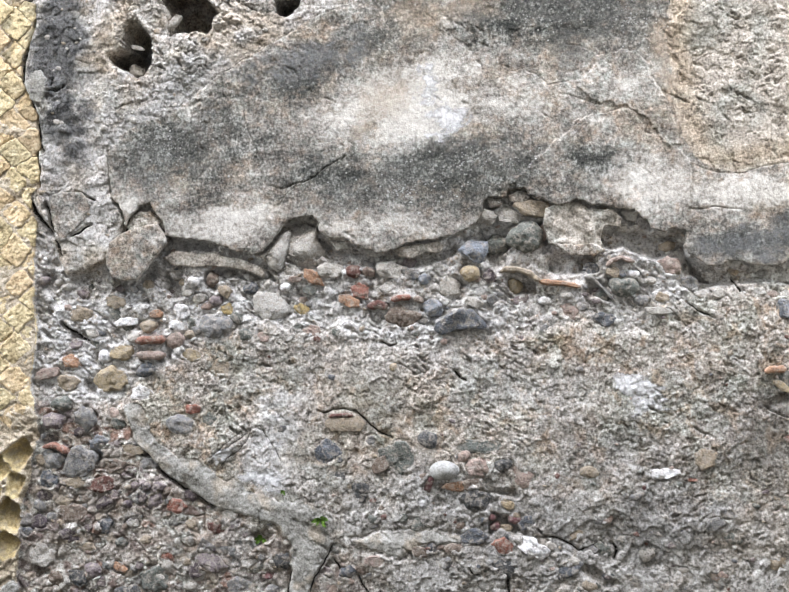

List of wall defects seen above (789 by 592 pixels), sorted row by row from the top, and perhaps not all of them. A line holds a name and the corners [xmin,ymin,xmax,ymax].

spalling [103,172,789,404]
peeling [417,430,443,449]
peeling [442,450,490,497]
peeling [694,449,718,471]
spalling [0,437,47,561]
peeling [184,489,199,502]
peeling [332,471,392,529]
peeling [399,508,432,532]
peeling [584,531,661,562]
peeling [146,558,203,591]
peeling [476,556,524,592]
peeling [528,541,615,592]